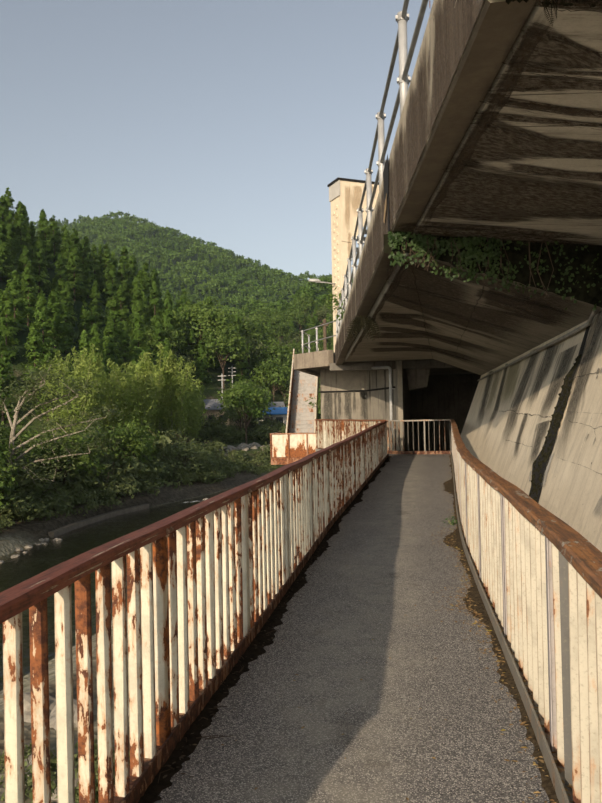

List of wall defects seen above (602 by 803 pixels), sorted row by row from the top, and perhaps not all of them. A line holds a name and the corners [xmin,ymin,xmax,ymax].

damp [335,0,602,364]
damp [479,364,508,424]
damp [505,310,602,459]